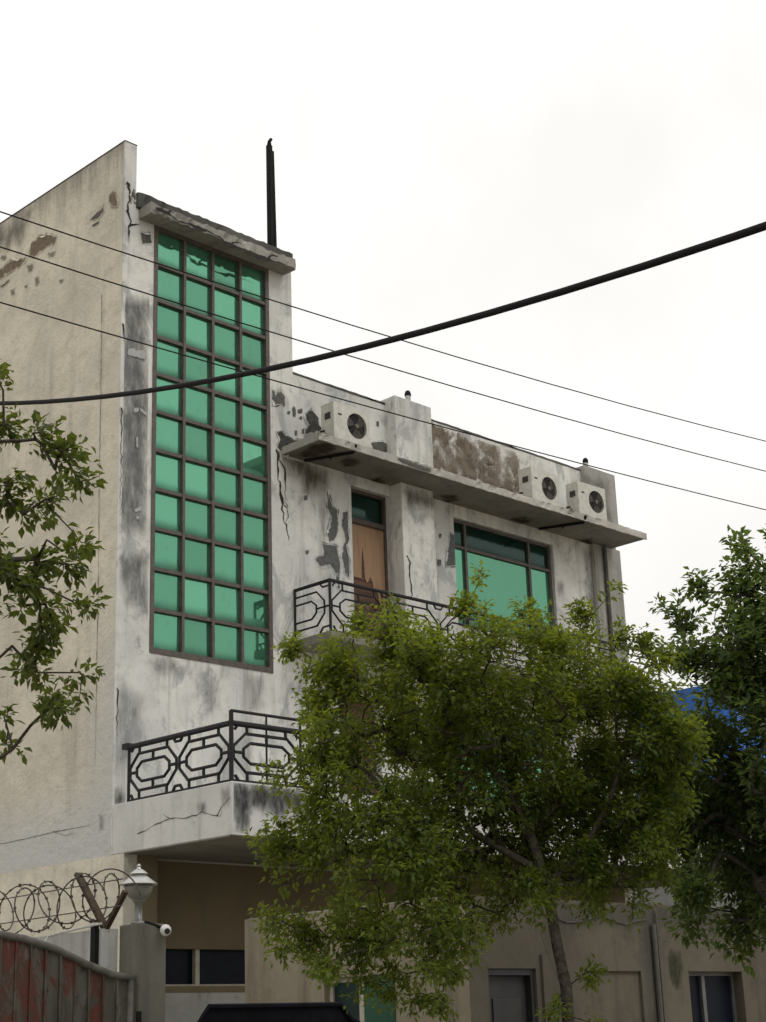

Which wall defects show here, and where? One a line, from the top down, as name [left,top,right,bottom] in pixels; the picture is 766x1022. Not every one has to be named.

peeling [0,234,57,295]
peeling [89,190,119,227]
peeling [139,232,152,246]
crack [126,181,279,263]
peeling [271,388,322,453]
crack [276,449,289,537]
peeling [306,489,350,590]
crack [137,797,230,834]